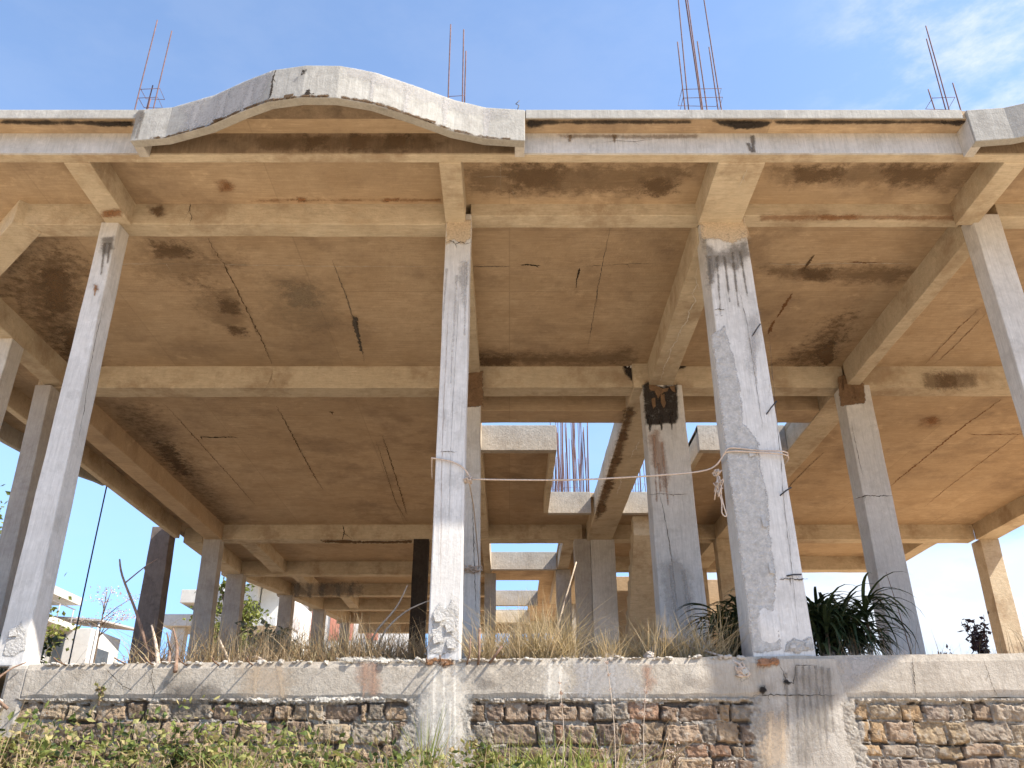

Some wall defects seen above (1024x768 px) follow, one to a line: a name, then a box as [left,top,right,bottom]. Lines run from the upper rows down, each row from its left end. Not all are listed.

leakage [6,237,113,356]
crack [184,205,323,489]
crack [576,231,649,344]
leakage [595,366,678,519]
spalling [648,384,675,409]
leakage [700,217,748,305]
leakage [803,269,829,280]
leakage [776,313,856,367]
crack [852,401,1019,501]
spalling [712,326,814,681]
spalling [336,599,460,668]